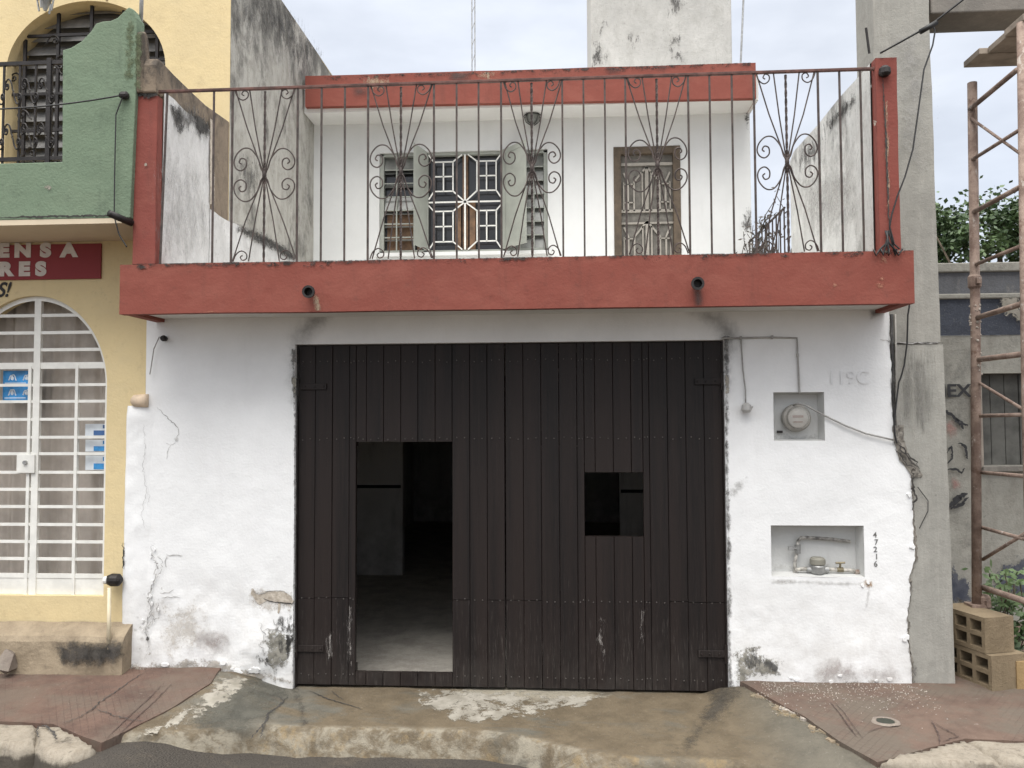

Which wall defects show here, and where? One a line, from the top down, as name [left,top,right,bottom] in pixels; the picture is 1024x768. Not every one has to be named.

water stain [171,105,210,138]
crack [35,409,181,739]
spalling [251,589,295,613]
spalling [892,425,923,683]
water stain [56,640,121,666]
water stain [259,616,296,671]
water stain [704,631,779,720]